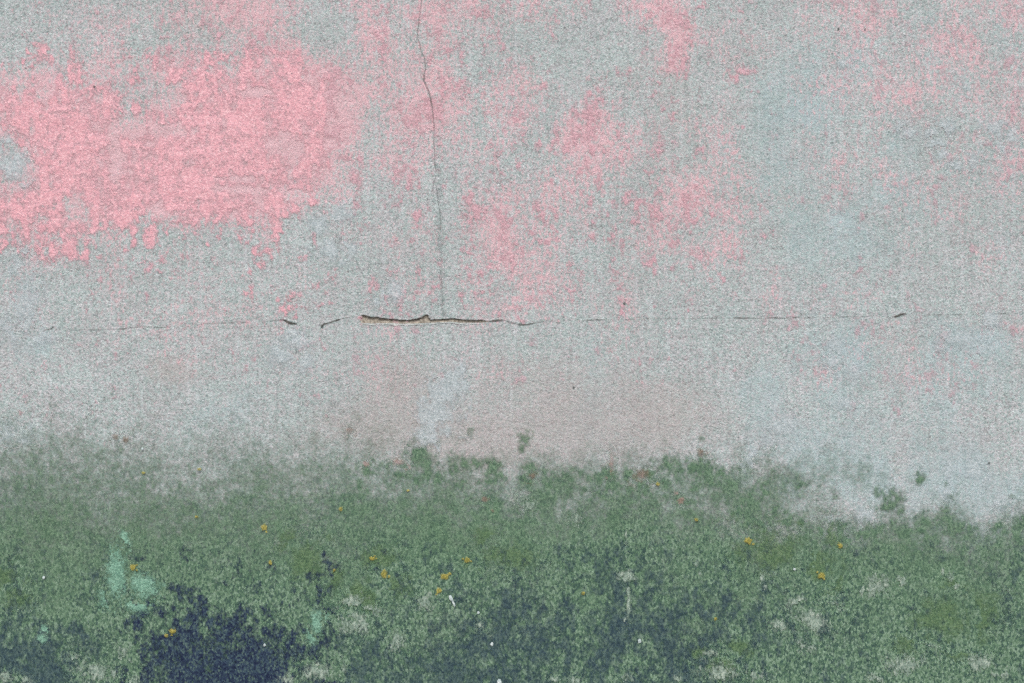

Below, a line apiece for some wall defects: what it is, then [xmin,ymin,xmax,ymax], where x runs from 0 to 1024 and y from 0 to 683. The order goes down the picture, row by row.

peeling [0,0,364,299]
crack [279,314,538,326]
damp [860,571,906,599]
damp [0,529,842,683]
damp [865,643,944,683]
damp [968,654,1008,681]